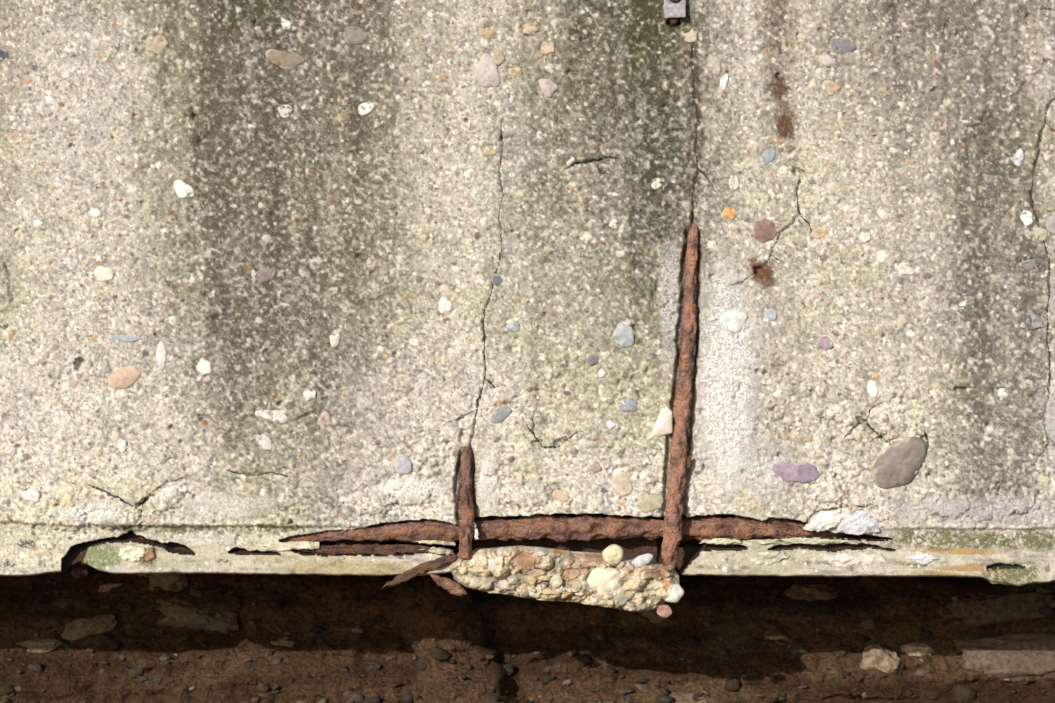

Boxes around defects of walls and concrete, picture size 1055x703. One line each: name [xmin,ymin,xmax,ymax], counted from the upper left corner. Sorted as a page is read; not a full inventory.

damp [168,0,366,415]
crack [449,123,504,447]
spalling [215,223,939,597]
damp [531,0,708,355]
rust [679,246,700,376]
damp [698,267,787,495]
crack [712,175,812,293]
rust [750,259,774,287]
rust [773,80,793,137]
damp [1016,246,1055,442]
crack [1030,97,1055,465]
spalling [61,530,195,572]